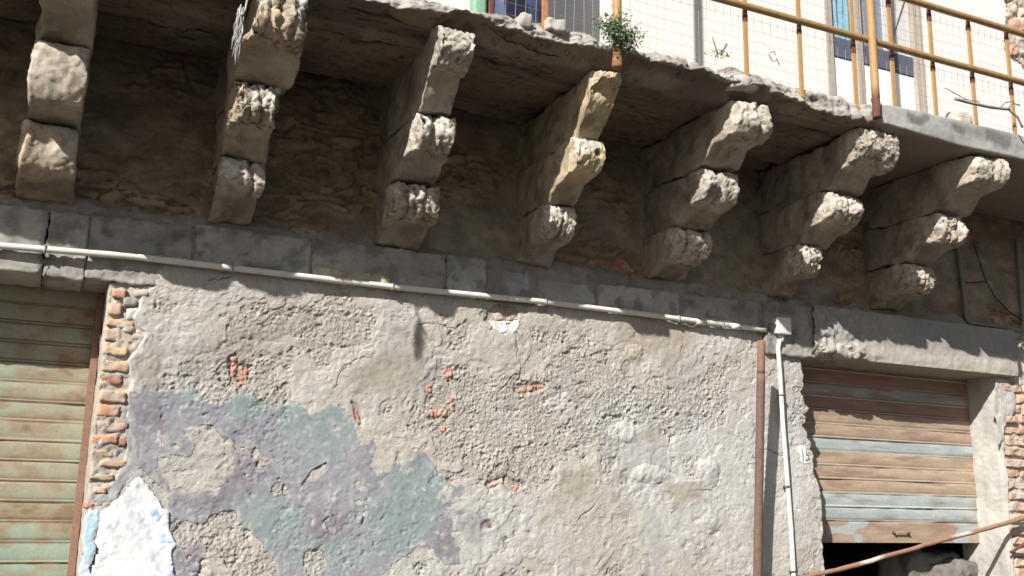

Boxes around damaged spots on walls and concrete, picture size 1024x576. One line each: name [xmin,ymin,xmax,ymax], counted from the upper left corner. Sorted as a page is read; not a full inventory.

spalling [489,312,519,333]
peeling [125,356,491,576]
peeling [78,510,100,576]